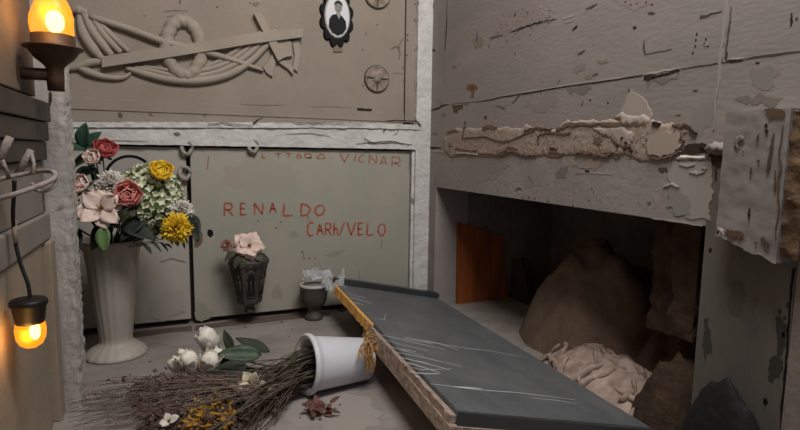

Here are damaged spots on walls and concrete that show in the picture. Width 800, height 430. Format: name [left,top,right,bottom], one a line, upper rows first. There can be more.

crack [357,4,643,165]
peeling [444,119,723,221]
spalling [756,108,785,173]